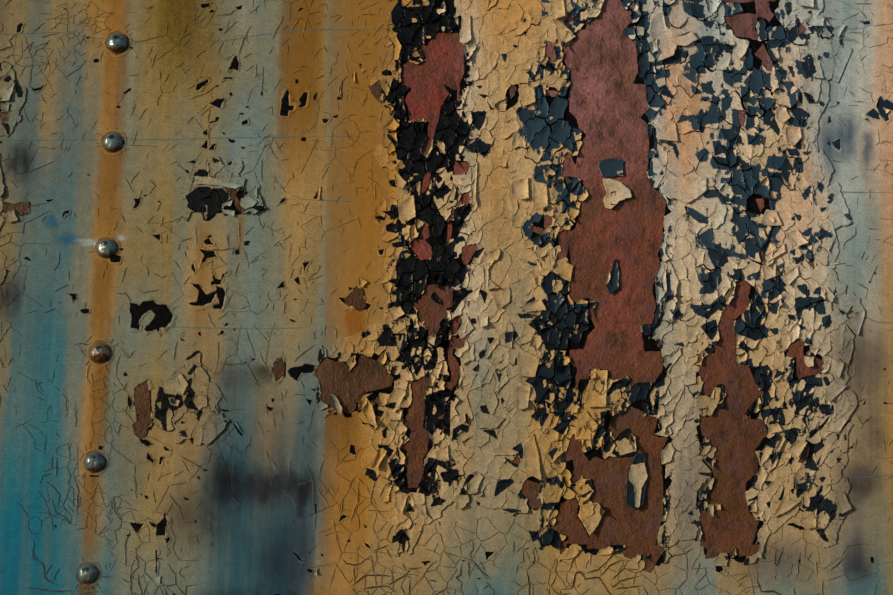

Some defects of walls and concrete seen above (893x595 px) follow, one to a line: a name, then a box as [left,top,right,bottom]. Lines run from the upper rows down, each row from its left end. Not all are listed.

peeling [0,61,46,143]
peeling [195,55,240,92]
peeling [181,92,287,221]
crack [824,0,893,127]
crack [831,130,893,201]
peeling [861,95,893,124]
peeling [127,296,176,337]
peeling [187,235,231,312]
peeling [269,0,876,575]
crack [839,218,893,339]
peeling [126,350,242,467]
crack [847,361,893,478]